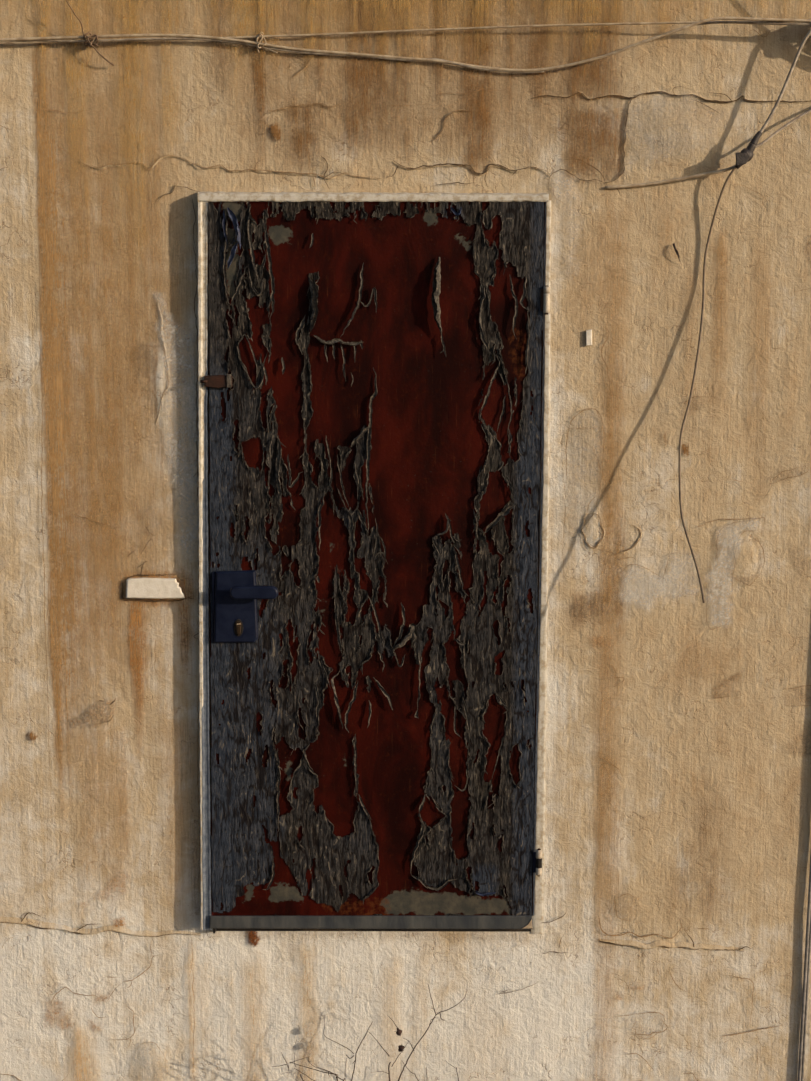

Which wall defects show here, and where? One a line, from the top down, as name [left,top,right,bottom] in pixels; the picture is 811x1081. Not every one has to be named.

water stain [345,0,416,140]
water stain [434,0,492,169]
water stain [33,0,116,759]
peeling [155,183,563,916]
crack [38,86,811,813]
crack [0,693,201,1079]
corrosion [249,931,260,947]